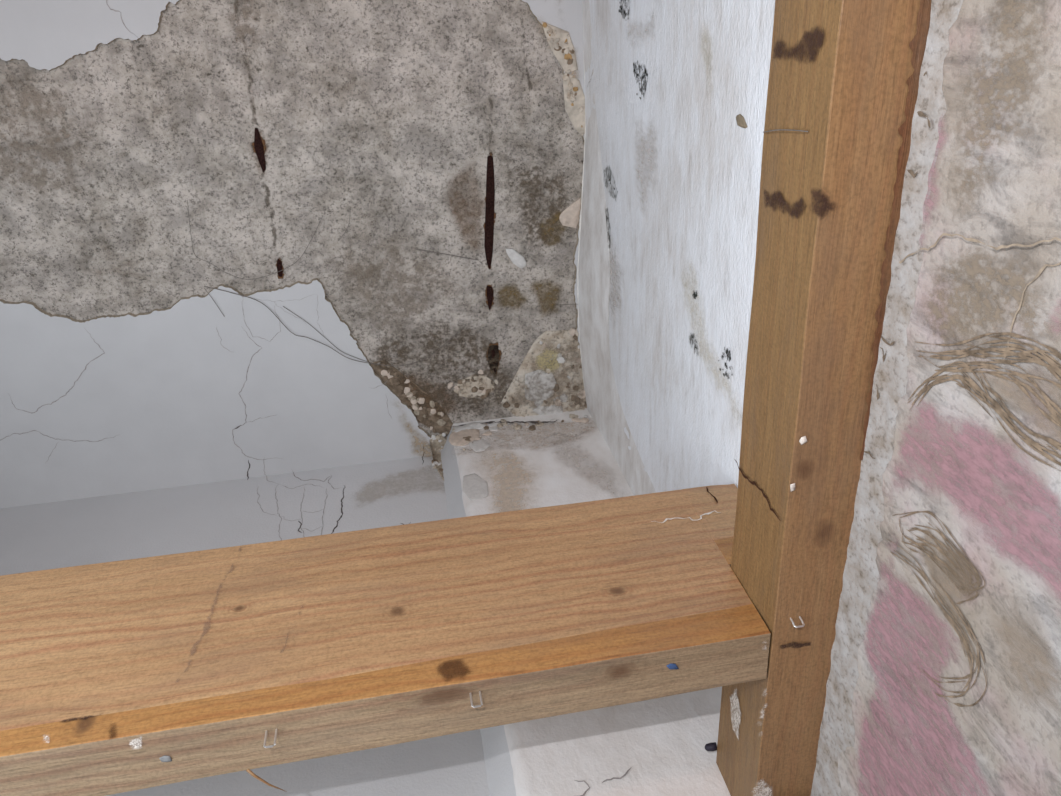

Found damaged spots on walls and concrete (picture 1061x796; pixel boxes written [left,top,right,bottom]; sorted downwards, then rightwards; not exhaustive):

rust [252,128,266,172]
spalling [0,0,590,480]
rust [450,152,496,270]
rust [485,283,559,313]
damp [516,166,566,242]
crack [1,329,117,464]
crack [216,294,344,540]
rust [486,342,502,376]